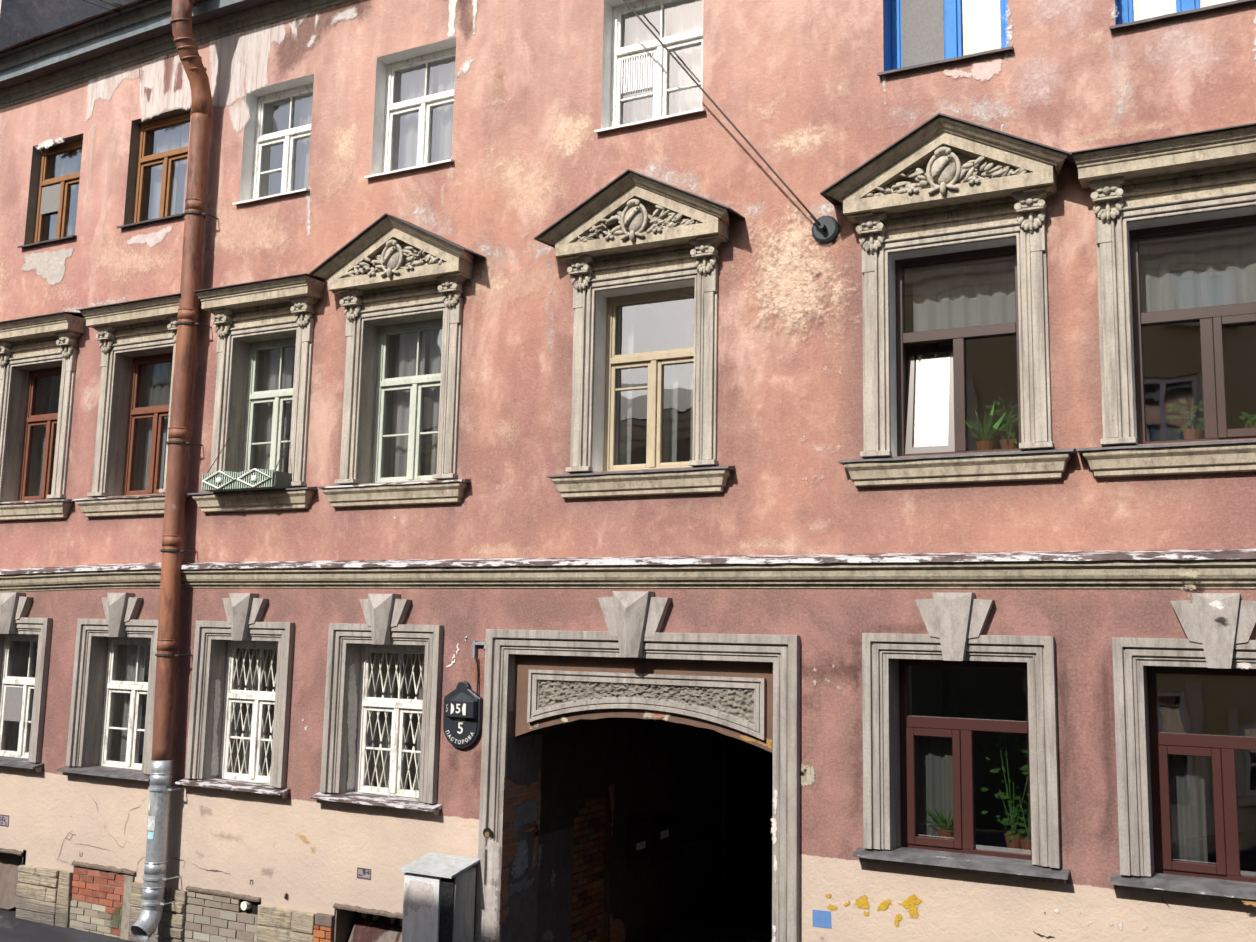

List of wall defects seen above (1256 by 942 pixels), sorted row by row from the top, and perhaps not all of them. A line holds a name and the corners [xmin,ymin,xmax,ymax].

damp [447,0,457,37]
peeling [86,54,192,121]
peeling [210,7,357,132]
flaking render [0,248,74,302]
peeling [95,226,172,281]
flaking render [483,769,541,925]